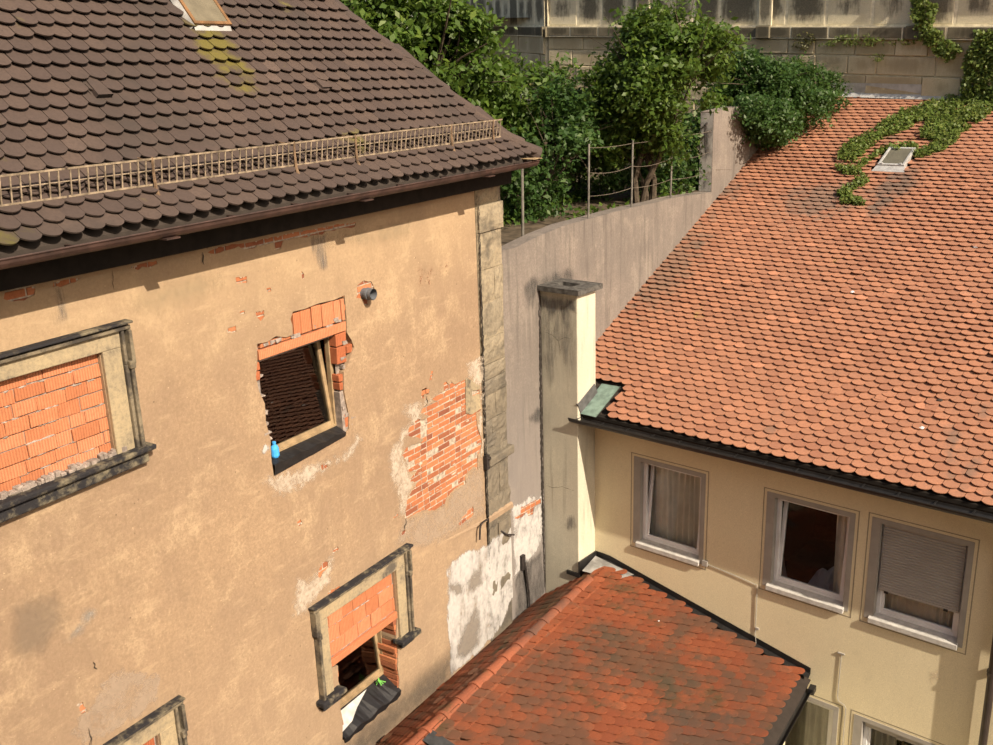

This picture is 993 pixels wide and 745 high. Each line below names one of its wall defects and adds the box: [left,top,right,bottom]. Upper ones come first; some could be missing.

flaking render [208,222,356,254]
flaking render [4,286,35,302]
flaking render [394,371,484,518]